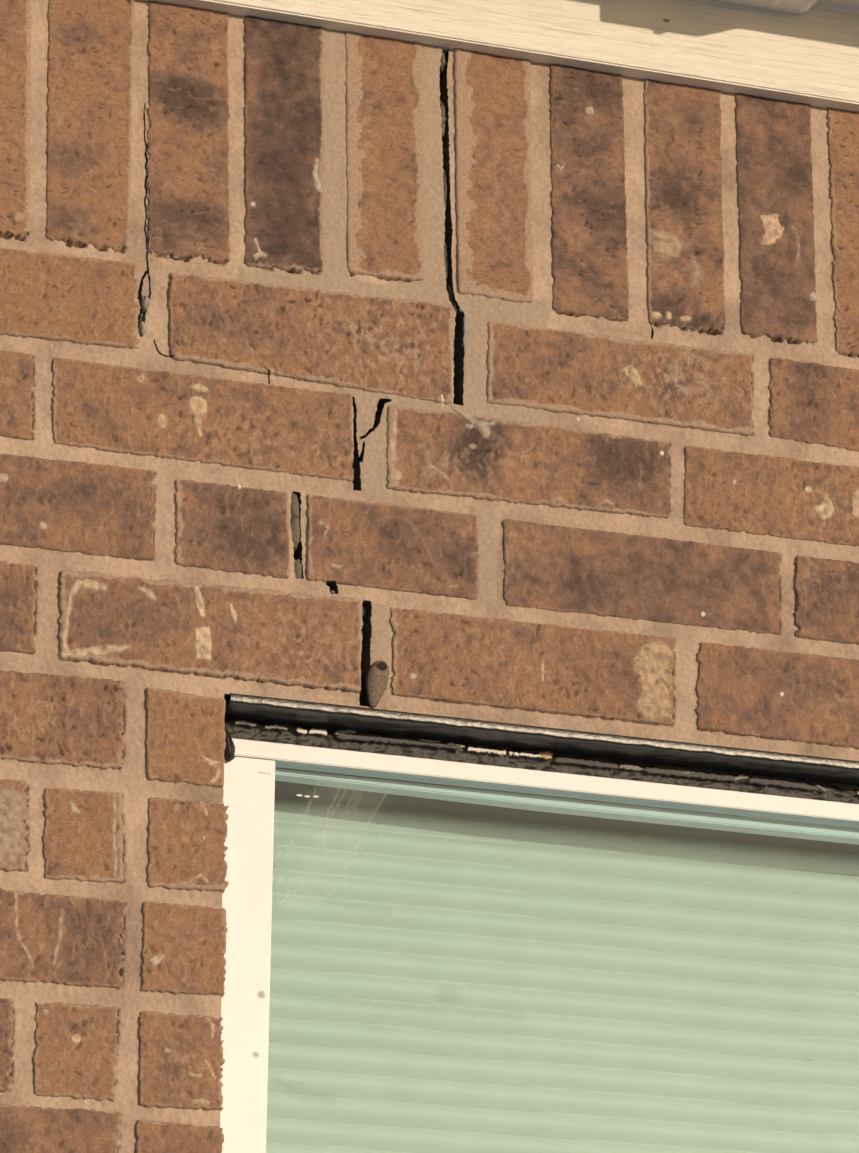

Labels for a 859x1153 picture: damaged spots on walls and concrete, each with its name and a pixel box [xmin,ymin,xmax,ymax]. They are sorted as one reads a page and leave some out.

crack [352,398,389,491]
crack [290,492,371,707]